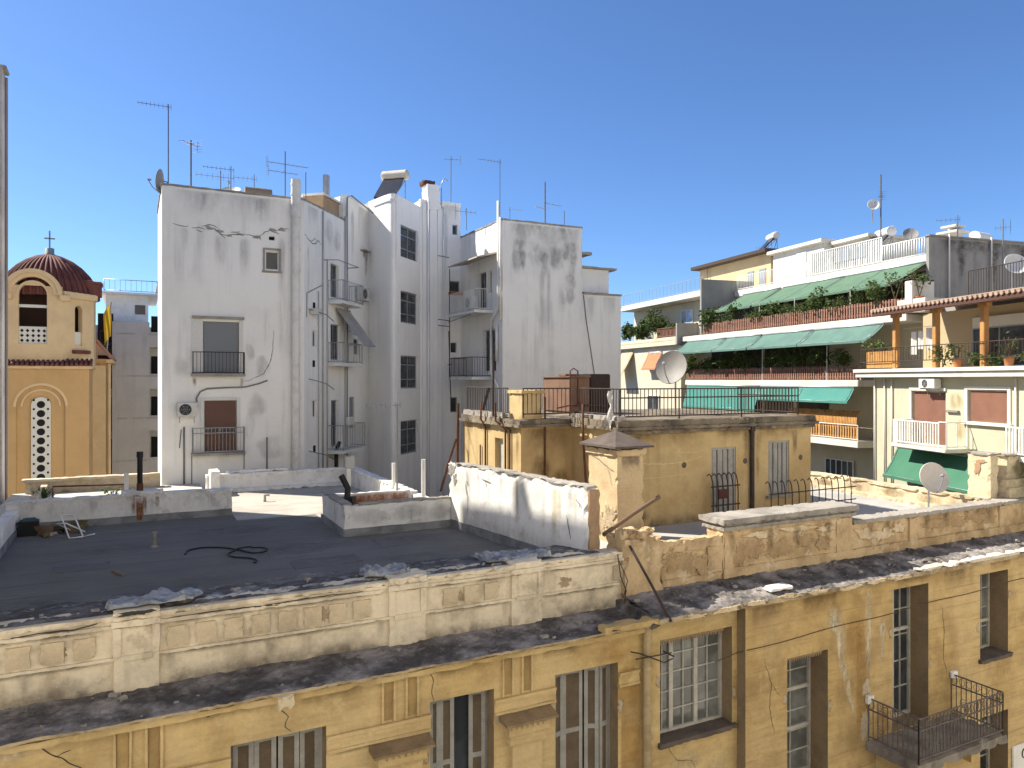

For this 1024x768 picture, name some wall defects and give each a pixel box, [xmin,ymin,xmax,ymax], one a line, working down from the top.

crack [173,223,322,245]
peeling [448,462,457,486]
flaking render [974,459,987,476]
rust [133,498,159,519]
flaking render [853,509,997,541]
flaking render [732,523,836,567]
flaking render [661,547,708,576]